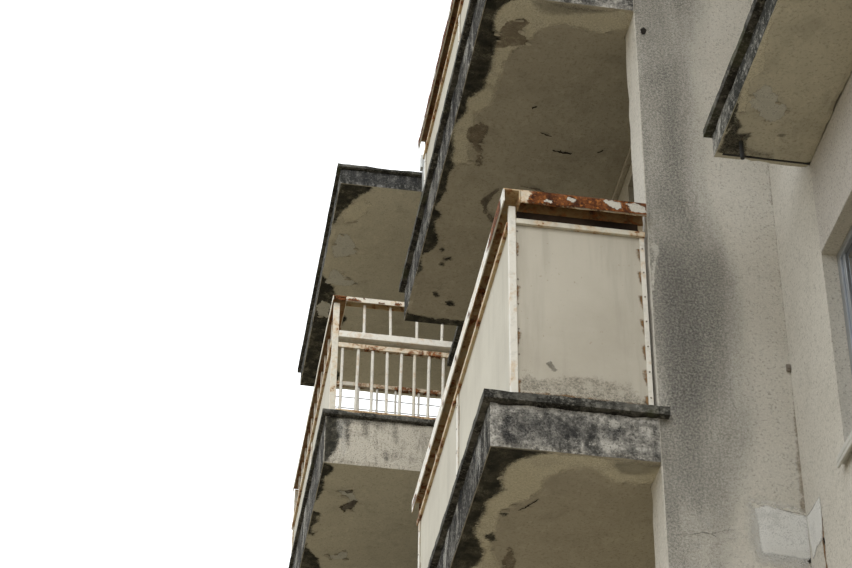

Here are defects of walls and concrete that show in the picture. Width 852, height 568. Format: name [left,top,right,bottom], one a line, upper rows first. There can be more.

corrosion [418,0,453,146]
water stain [407,0,514,280]
water stain [717,94,750,155]
water stain [333,170,419,223]
corrosion [527,192,647,215]
water stain [301,276,336,387]
water stain [405,312,464,327]
water stain [294,416,349,568]
water stain [440,411,623,568]